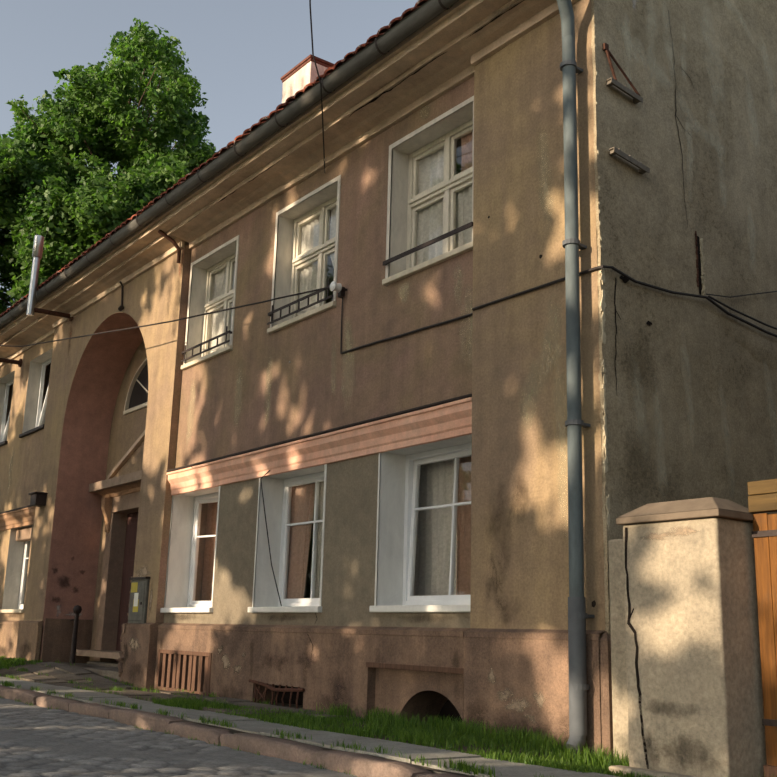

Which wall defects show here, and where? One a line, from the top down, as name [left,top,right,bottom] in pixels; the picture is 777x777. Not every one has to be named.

crack [467,0,524,38]
crack [349,51,448,117]
crack [668,10,693,228]
spalling [695,231,706,296]
crack [625,527,649,768]